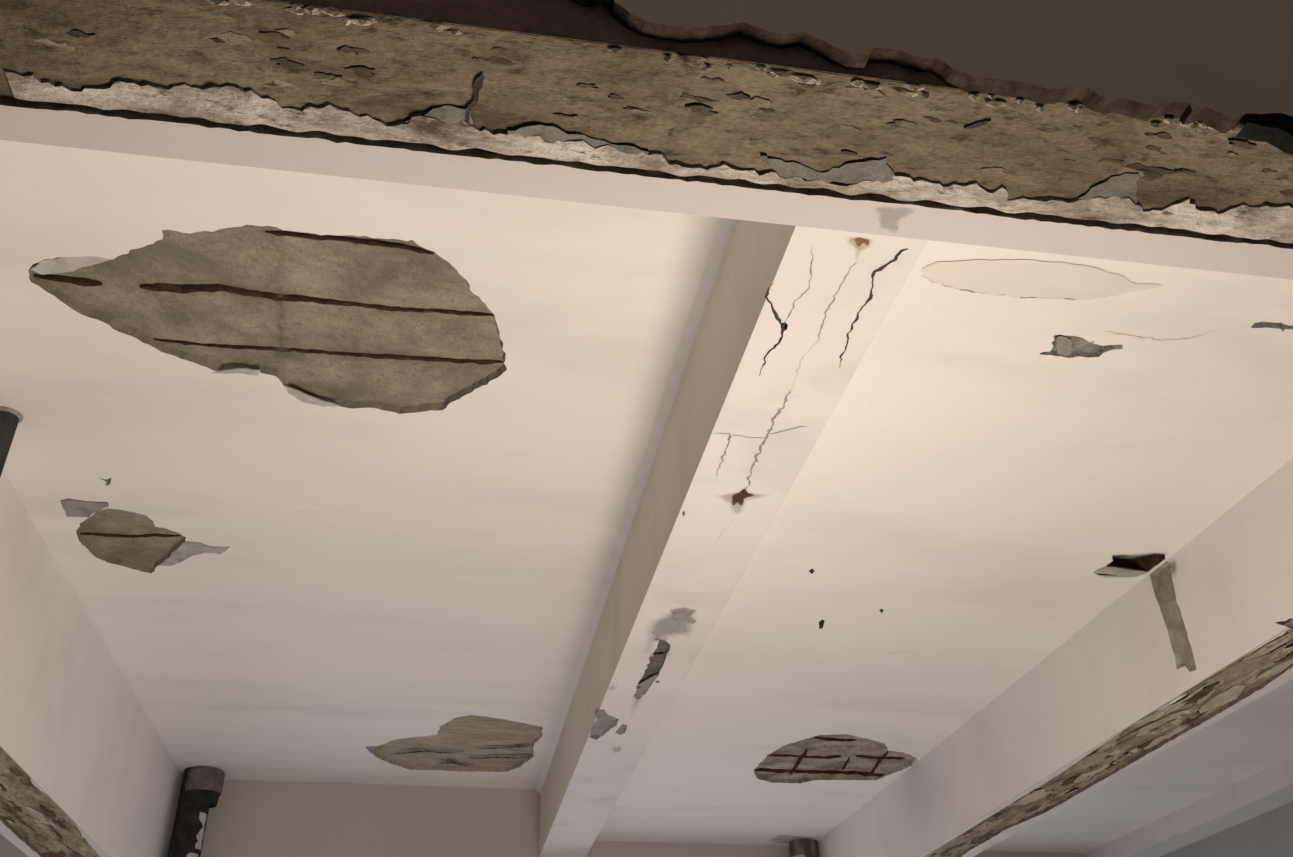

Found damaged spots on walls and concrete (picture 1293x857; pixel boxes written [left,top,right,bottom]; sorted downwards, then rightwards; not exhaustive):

spalling [0,0,1293,243]
spalling [28,225,507,414]
crack [714,248,908,489]
spalling [1040,335,1123,358]
spalling [1251,322,1293,332]
spalling [61,499,230,573]
spalling [366,715,543,772]
flaking render [589,708,627,753]
flaking render [633,637,670,700]
spalling [754,734,917,783]
spalling [924,553,1293,857]
spalling [0,747,100,857]